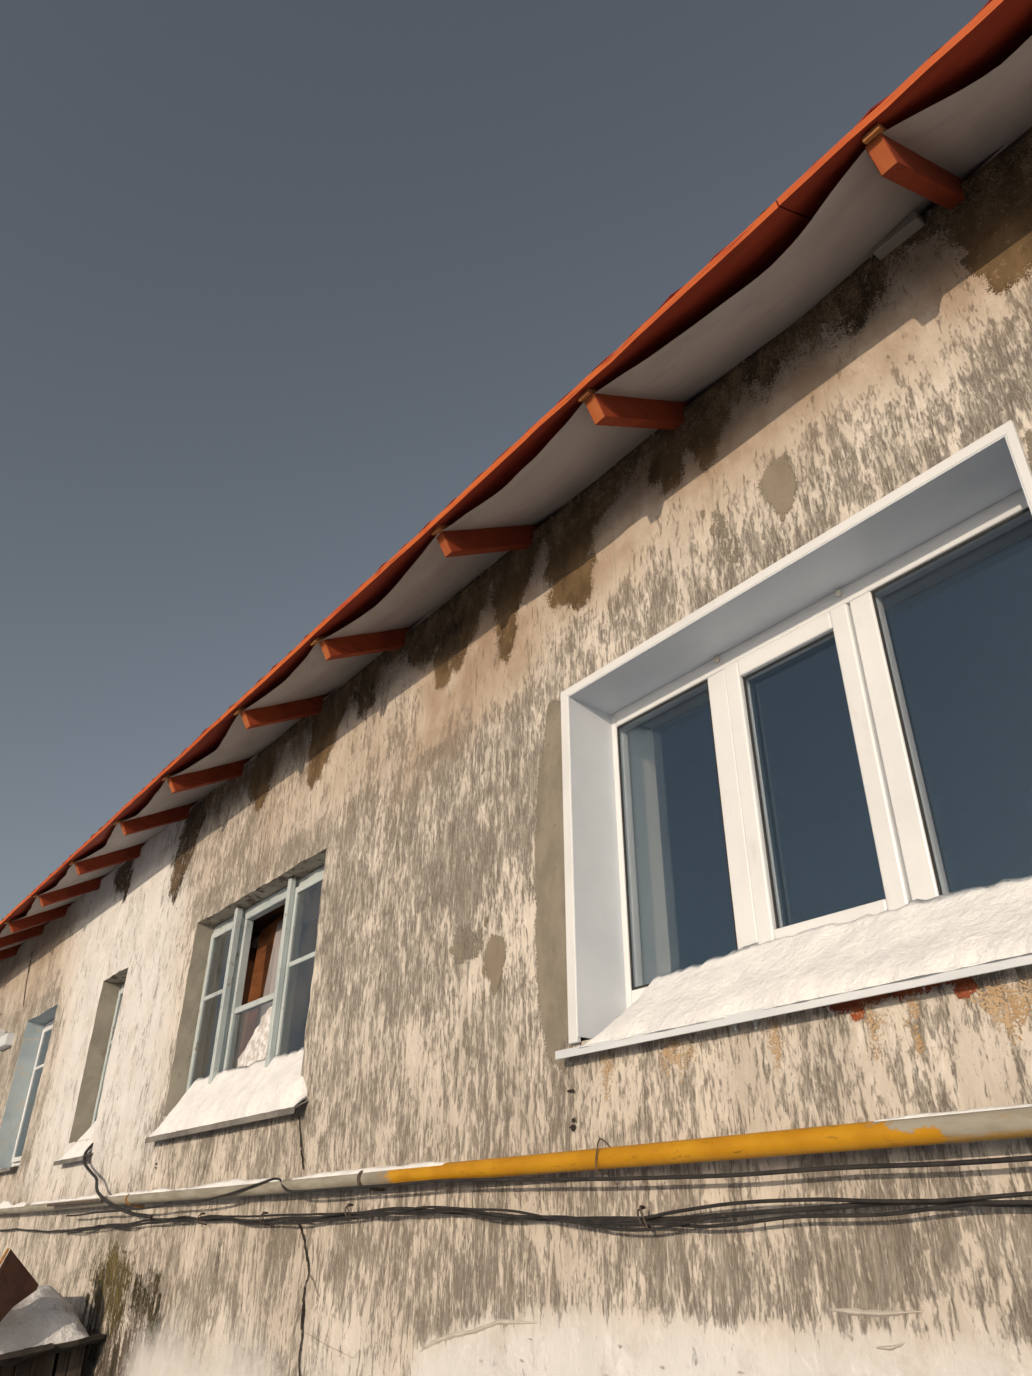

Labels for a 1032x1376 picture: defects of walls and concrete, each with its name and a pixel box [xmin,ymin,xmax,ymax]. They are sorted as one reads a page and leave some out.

water stain [167,127,1032,906]
flaking render [822,977,978,1021]
water stain [81,1262,163,1376]
crack [289,1221,358,1376]